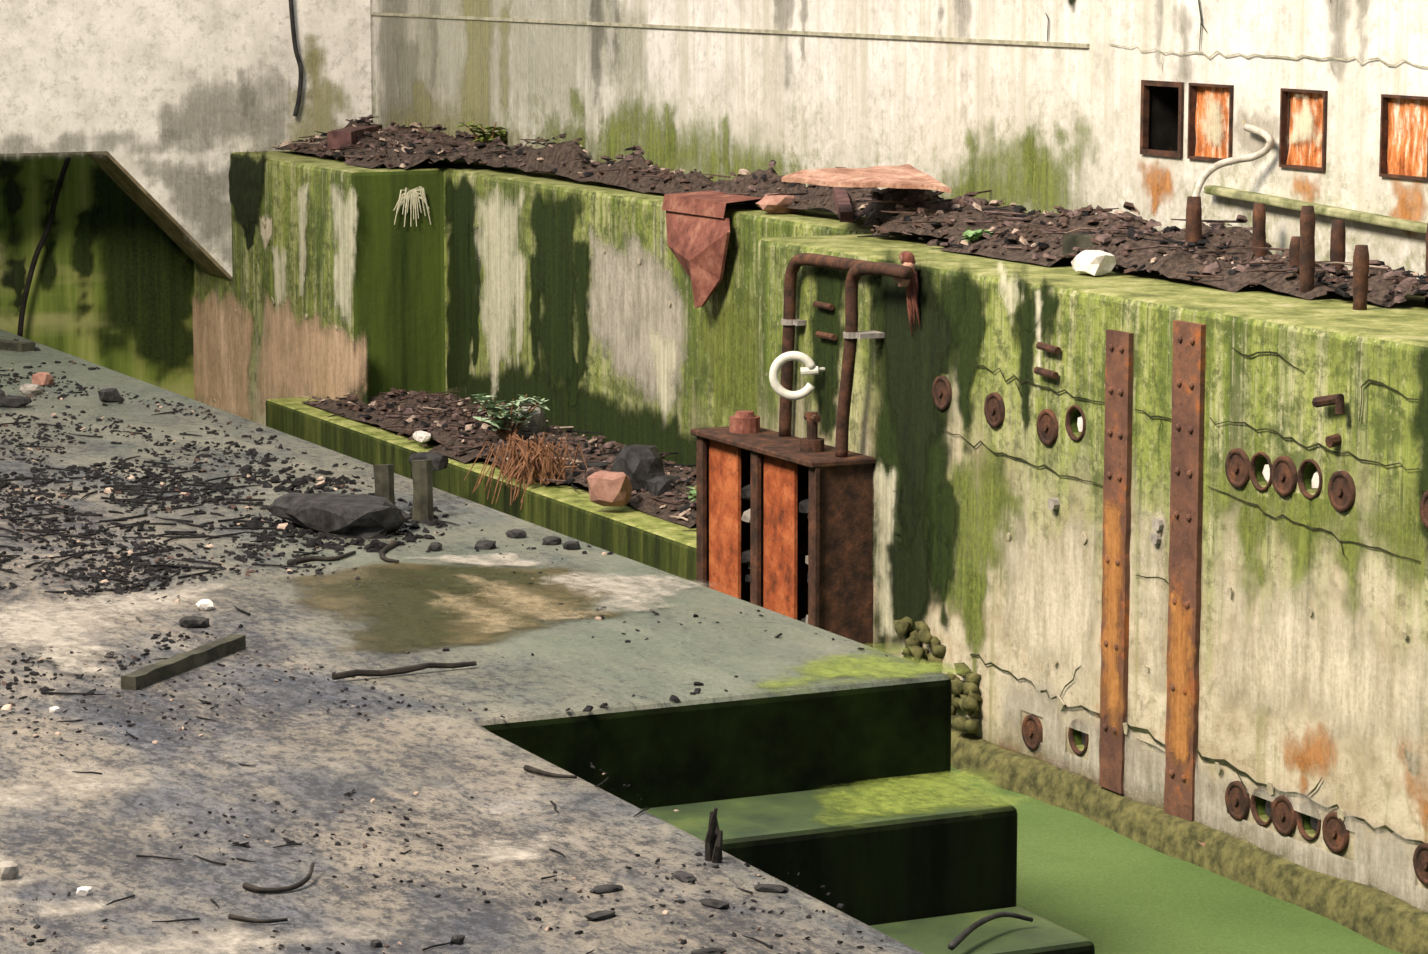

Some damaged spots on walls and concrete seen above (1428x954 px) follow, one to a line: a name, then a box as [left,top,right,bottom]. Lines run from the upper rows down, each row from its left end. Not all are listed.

leakage [0,134,194,372]
leakage [332,188,370,405]
efflorescence [439,554,537,566]
leakage [445,175,696,469]
leakage [810,266,845,437]
leakage [869,251,1020,672]
rust [1101,504,1122,726]
rust [1169,593,1192,762]
crack [970,654,1424,844]
rust [1285,726,1333,789]
rust [1391,181,1424,221]
leakage [1412,346,1428,548]